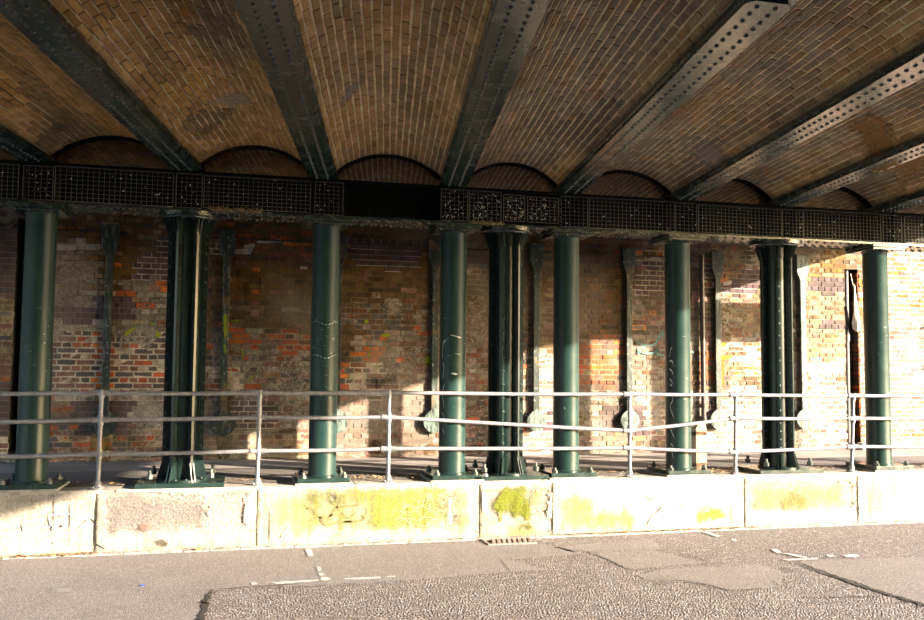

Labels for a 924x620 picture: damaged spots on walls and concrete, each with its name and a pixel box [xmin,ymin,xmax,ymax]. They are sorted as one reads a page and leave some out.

leakage [445,488,460,527]